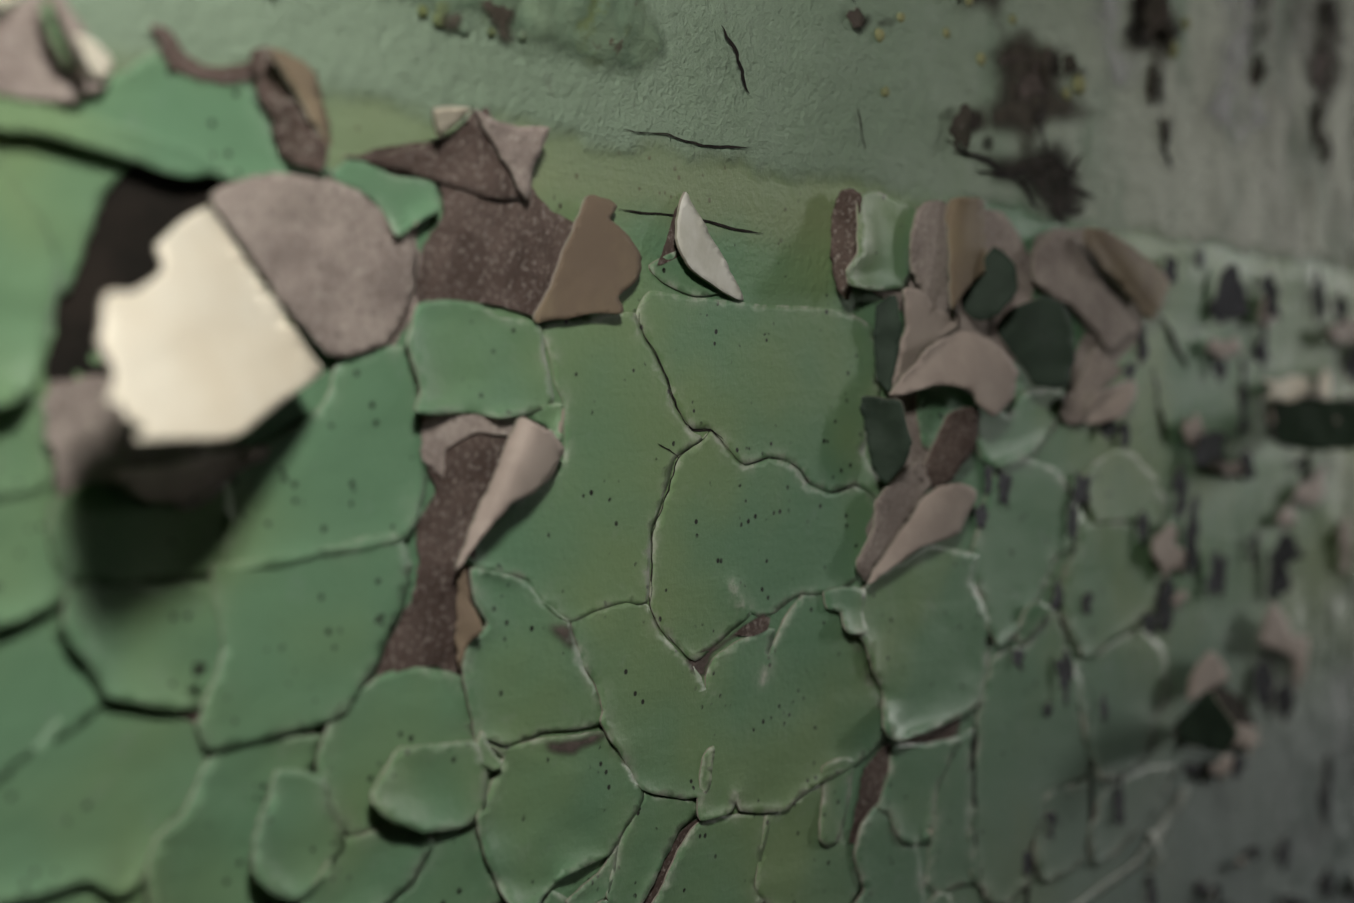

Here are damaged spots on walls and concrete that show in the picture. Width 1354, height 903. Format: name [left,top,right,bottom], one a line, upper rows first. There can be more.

spalling [949,14,1087,152]
spalling [1127,0,1190,144]
spalling [1248,29,1269,98]
peeling [0,0,664,903]
crack [639,320,723,646]
crack [750,457,873,494]
peeling [461,188,1200,903]
crack [1143,315,1187,447]
peeling [1180,264,1354,727]
peeling [1172,651,1262,782]
crack [970,711,989,903]
crack [1087,771,1095,840]